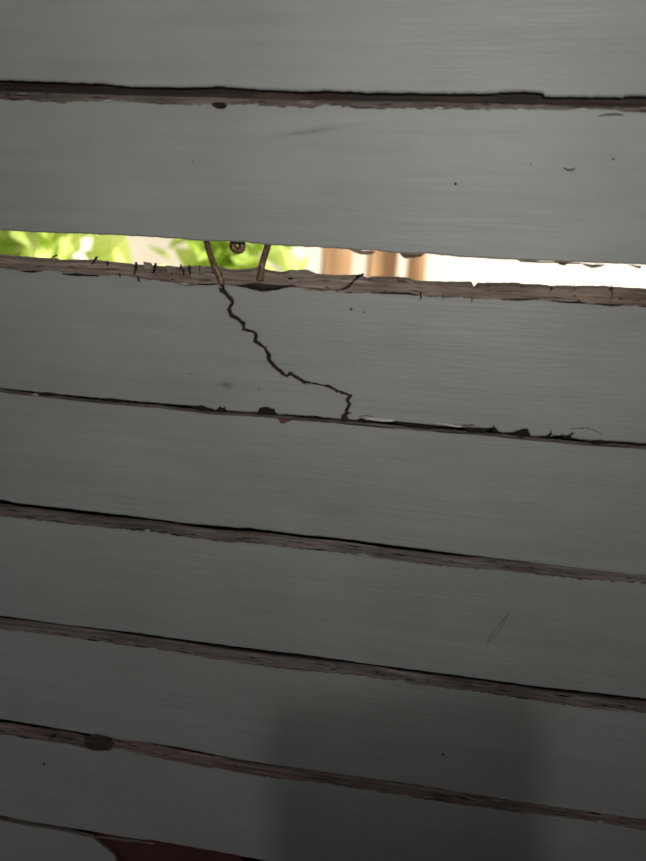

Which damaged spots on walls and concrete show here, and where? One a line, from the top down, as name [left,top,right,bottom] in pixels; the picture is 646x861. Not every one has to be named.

crack [90,256,201,282]
crack [219,284,352,421]
peeling [0,724,646,830]
spalling [94,832,243,861]